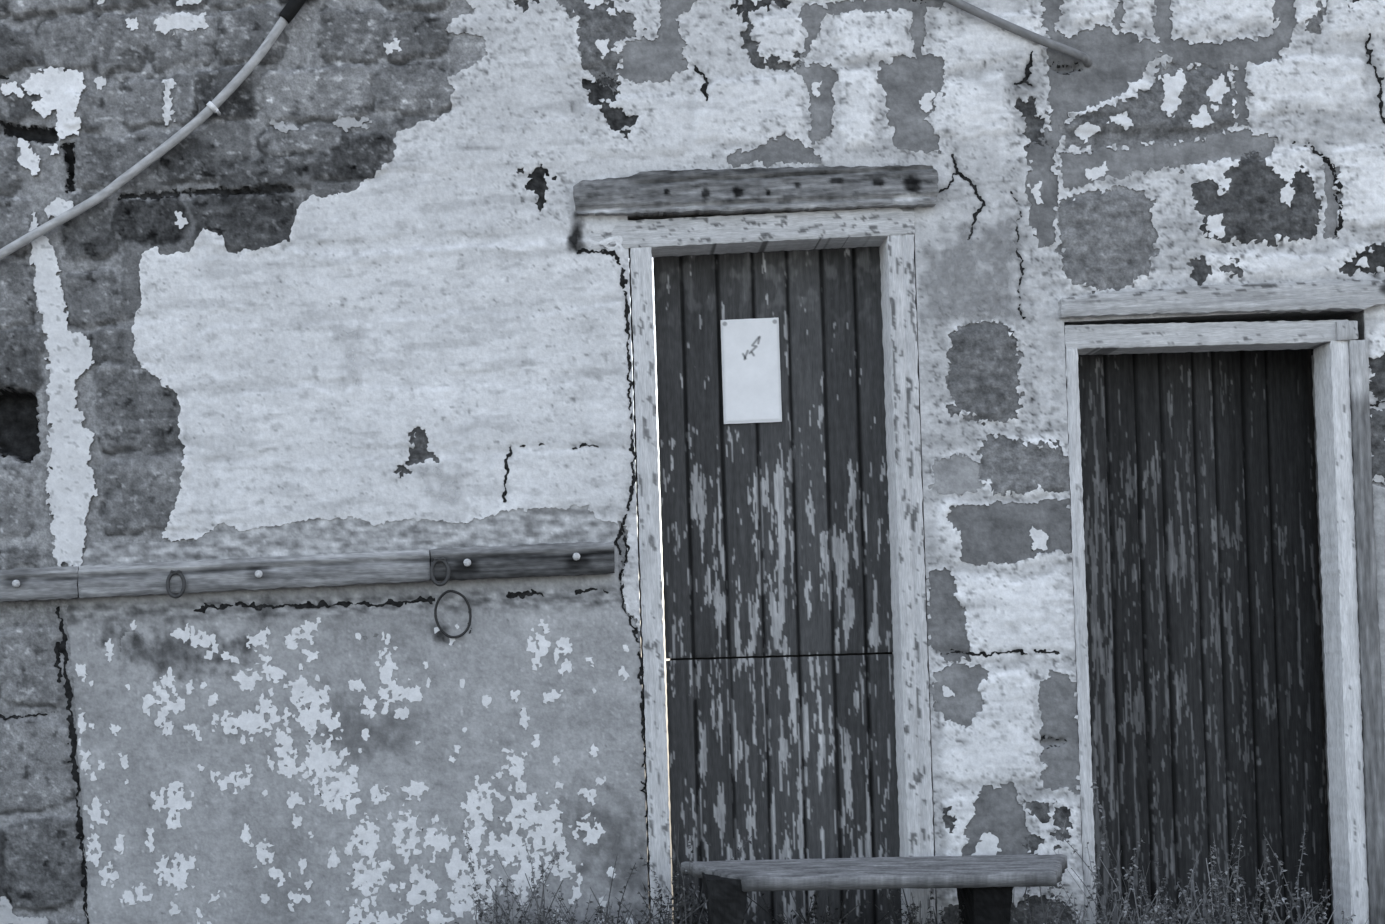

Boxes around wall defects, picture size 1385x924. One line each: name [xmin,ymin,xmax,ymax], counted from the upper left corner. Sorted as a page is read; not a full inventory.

peeling [0,197,99,567]
peeling [0,66,107,176]
crack [194,596,435,613]
crack [502,248,651,902]
peeling [727,0,946,168]
crack [939,154,1026,319]
peeling [926,321,1072,728]
peeling [1014,0,1343,294]
crack [1365,33,1385,124]
crack [0,606,90,924]
peeling [125,617,606,924]
peeling [942,669,1080,856]